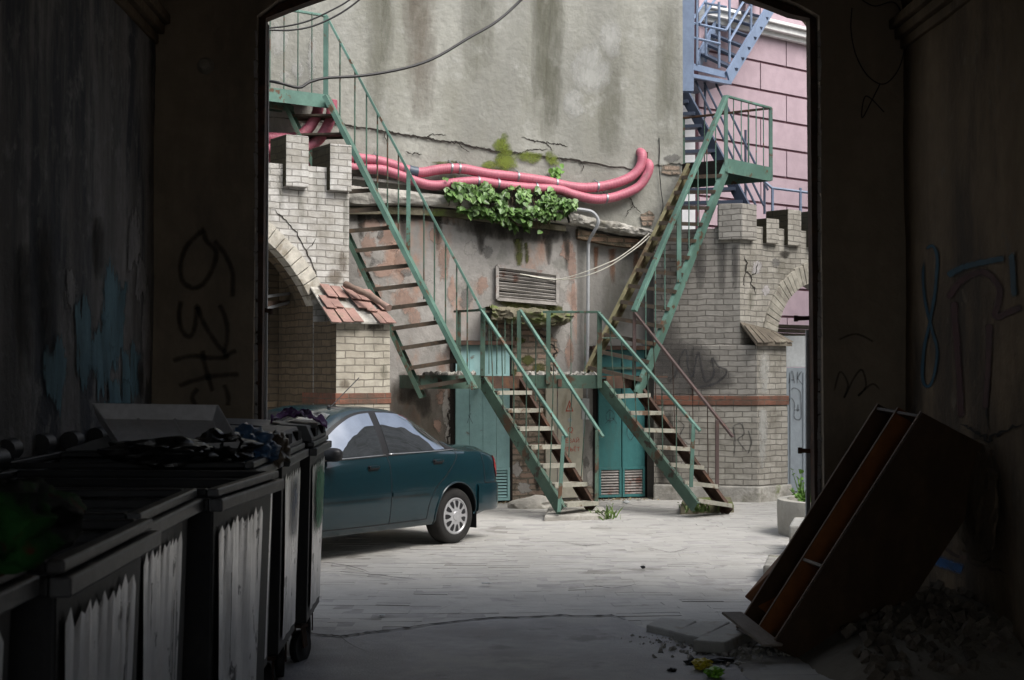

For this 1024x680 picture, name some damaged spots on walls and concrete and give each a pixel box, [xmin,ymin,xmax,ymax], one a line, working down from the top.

leakage [573,27,619,87]
crack [321,122,632,171]
crack [272,209,317,276]
peeling [358,219,488,324]
leakage [465,220,570,265]
crack [743,259,758,294]
peeling [42,258,141,416]
spalling [485,240,576,500]
spalling [400,388,451,444]
crack [296,605,625,651]